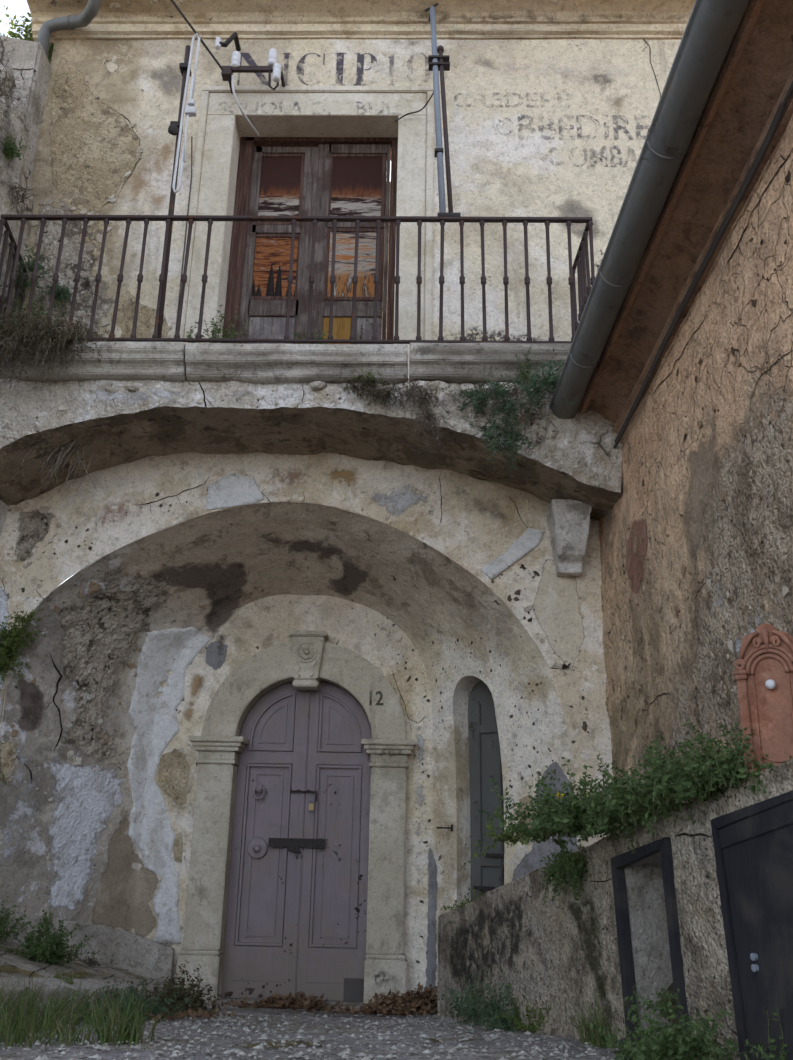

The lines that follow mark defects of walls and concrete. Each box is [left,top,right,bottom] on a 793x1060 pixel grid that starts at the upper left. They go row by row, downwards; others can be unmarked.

crack [643,39,661,97]
peeling [27,58,172,342]
leakage [562,202,597,235]
crack [725,148,793,267]
crack [653,314,707,394]
crack [750,351,792,398]
crack [139,475,210,511]
peeling [7,502,127,601]
crack [16,654,68,783]
peeling [0,626,210,946]
leakage [450,897,530,999]